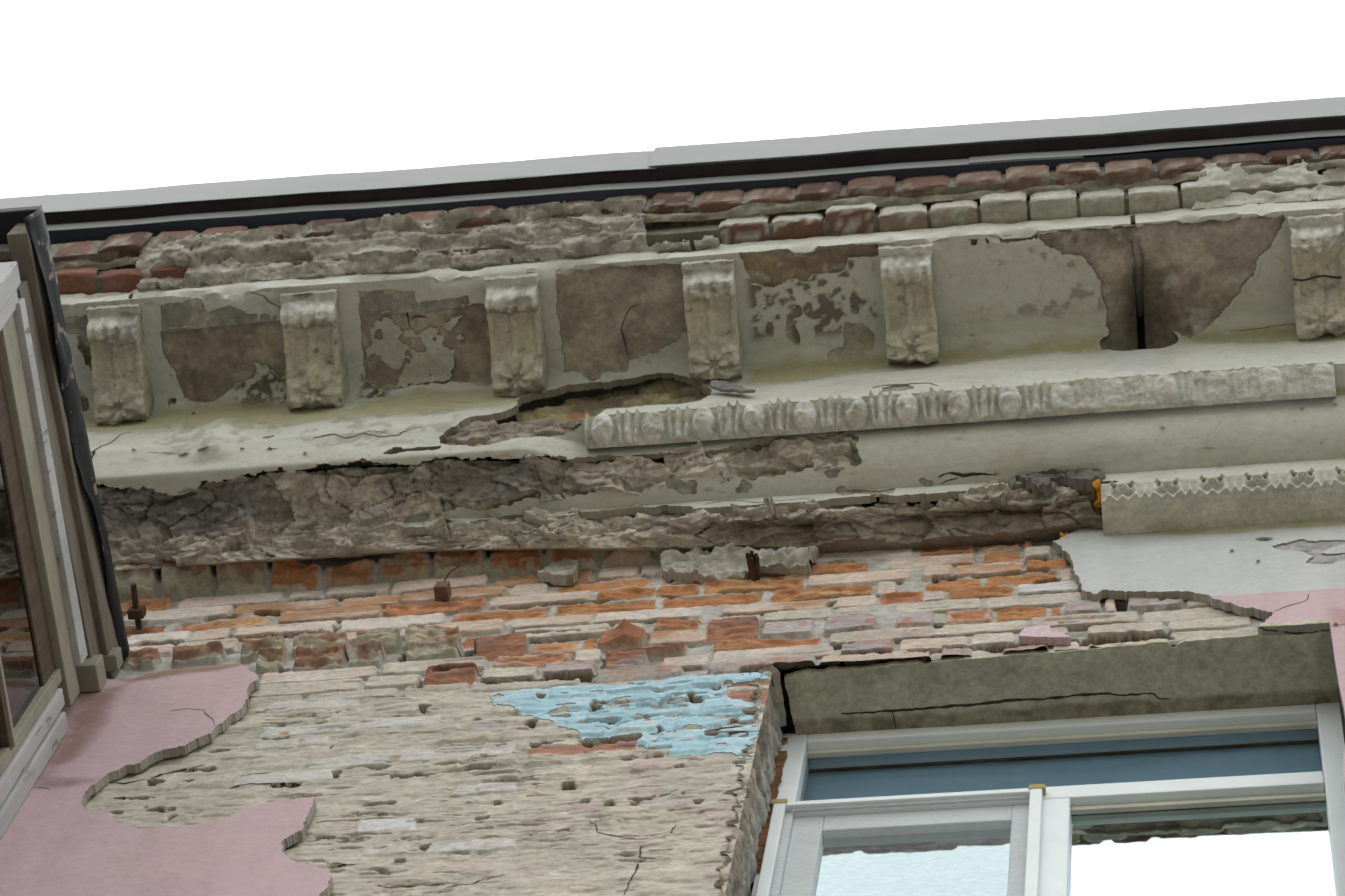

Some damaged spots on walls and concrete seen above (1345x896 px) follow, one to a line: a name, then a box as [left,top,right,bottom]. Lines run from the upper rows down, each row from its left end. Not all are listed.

flaking render [740,244,879,287]
flaking render [971,155,1345,351]
flaking render [359,289,492,391]
flaking render [441,263,756,460]
flaking render [786,305,802,345]
flaking render [826,323,875,360]
spalling [658,476,697,494]
spalling [906,478,957,507]
flaking render [1015,468,1106,497]
flaking render [1255,537,1345,564]
spalling [84,540,1265,896]
crack [842,692,1171,729]